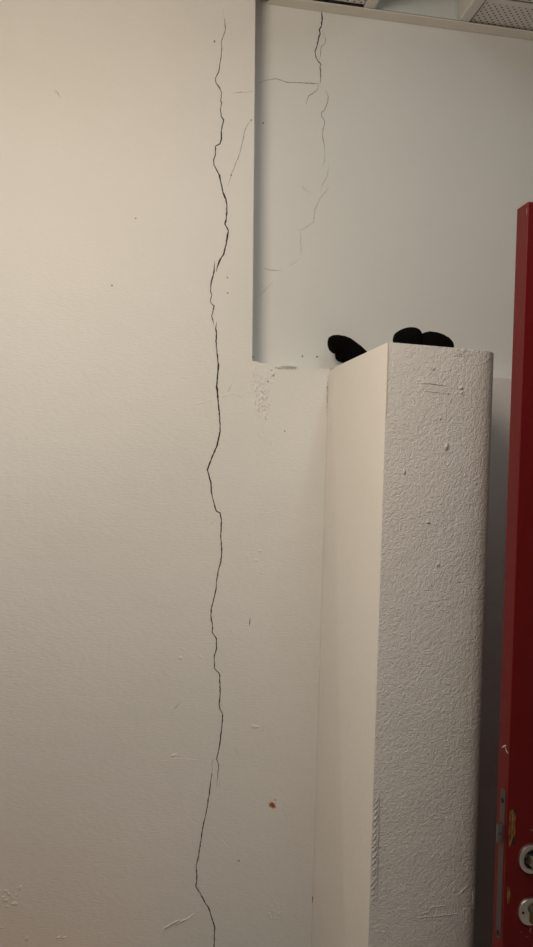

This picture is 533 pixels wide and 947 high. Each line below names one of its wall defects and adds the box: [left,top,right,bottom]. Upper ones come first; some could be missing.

crack [195,9,329,947]